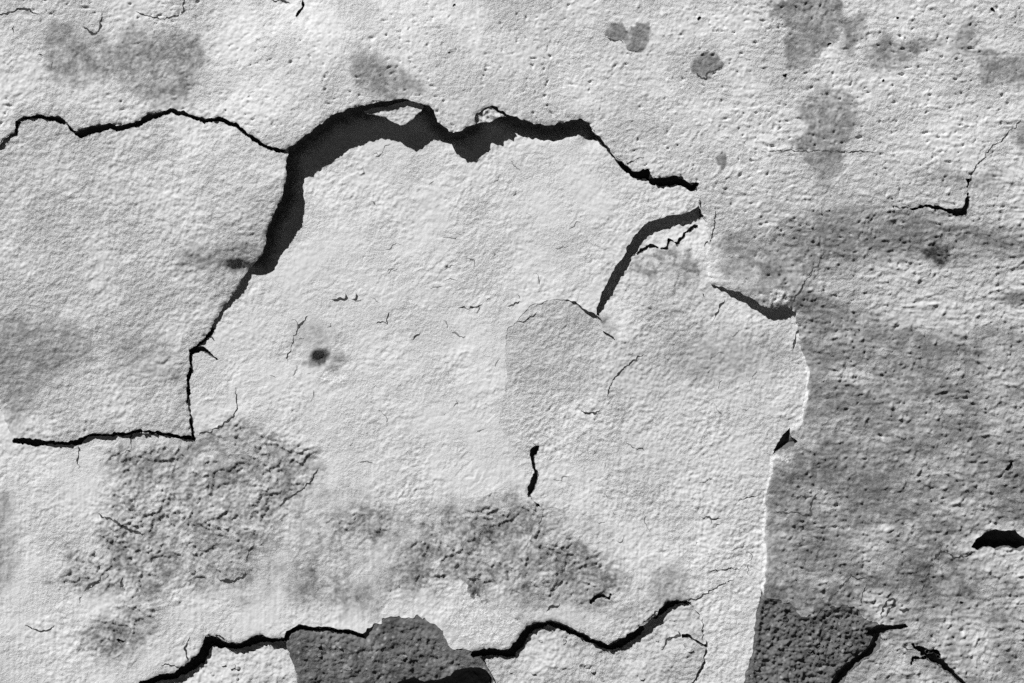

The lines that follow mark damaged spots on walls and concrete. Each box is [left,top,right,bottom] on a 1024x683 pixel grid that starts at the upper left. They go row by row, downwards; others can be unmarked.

crack [0,108,285,153]
crack [591,128,716,256]
crack [891,120,1021,217]
crack [12,328,238,469]
crack [270,294,389,401]
spalling [156,98,879,683]
damp [107,435,315,601]
crack [527,442,568,525]
damp [93,610,153,648]
crack [139,624,365,683]
damp [443,581,523,648]
crack [903,643,966,683]